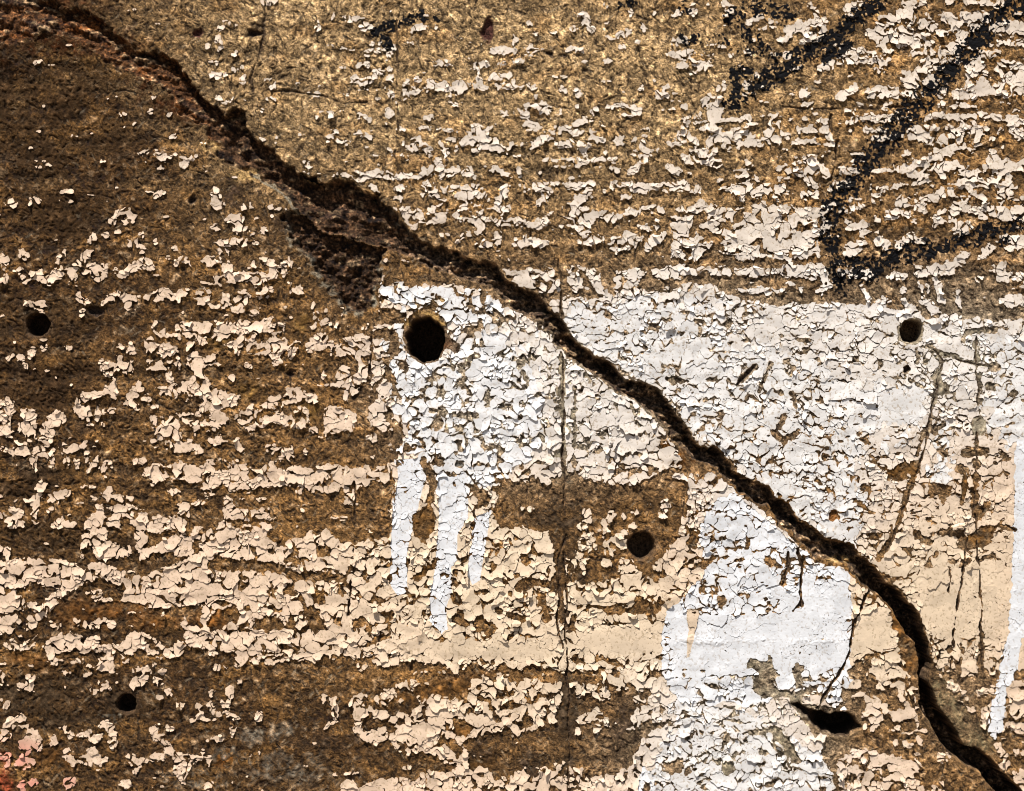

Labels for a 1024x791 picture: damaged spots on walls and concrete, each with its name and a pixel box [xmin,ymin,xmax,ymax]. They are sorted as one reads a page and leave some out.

peeling [192,20,264,85]
peeling [137,133,207,172]
crack [0,0,417,260]
crack [782,106,840,180]
peeling [0,196,42,215]
peeling [23,300,48,314]
peeling [6,339,57,379]
crack [366,332,374,376]
peeling [300,0,1024,791]
crack [347,481,357,615]
crack [416,235,1020,791]
peeling [0,662,118,791]